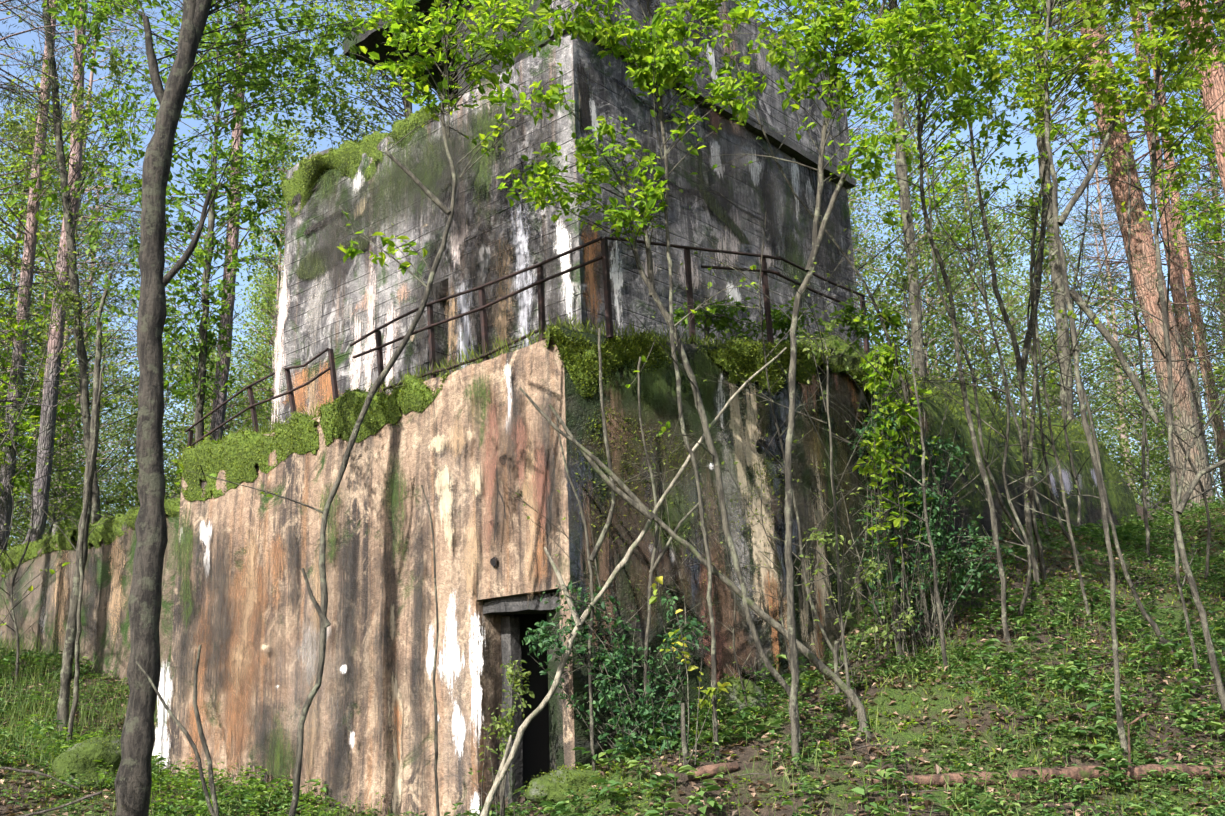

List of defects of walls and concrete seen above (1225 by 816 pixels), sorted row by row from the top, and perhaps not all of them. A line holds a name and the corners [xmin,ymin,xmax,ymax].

leakage [349,257,376,391]
leakage [419,74,574,446]
rust [581,227,623,326]
rust [287,363,339,417]
leakage [505,363,521,468]
spalling [756,439,769,454]
leakage [281,483,359,807]
leakage [373,456,483,815]
leakage [238,700,295,791]